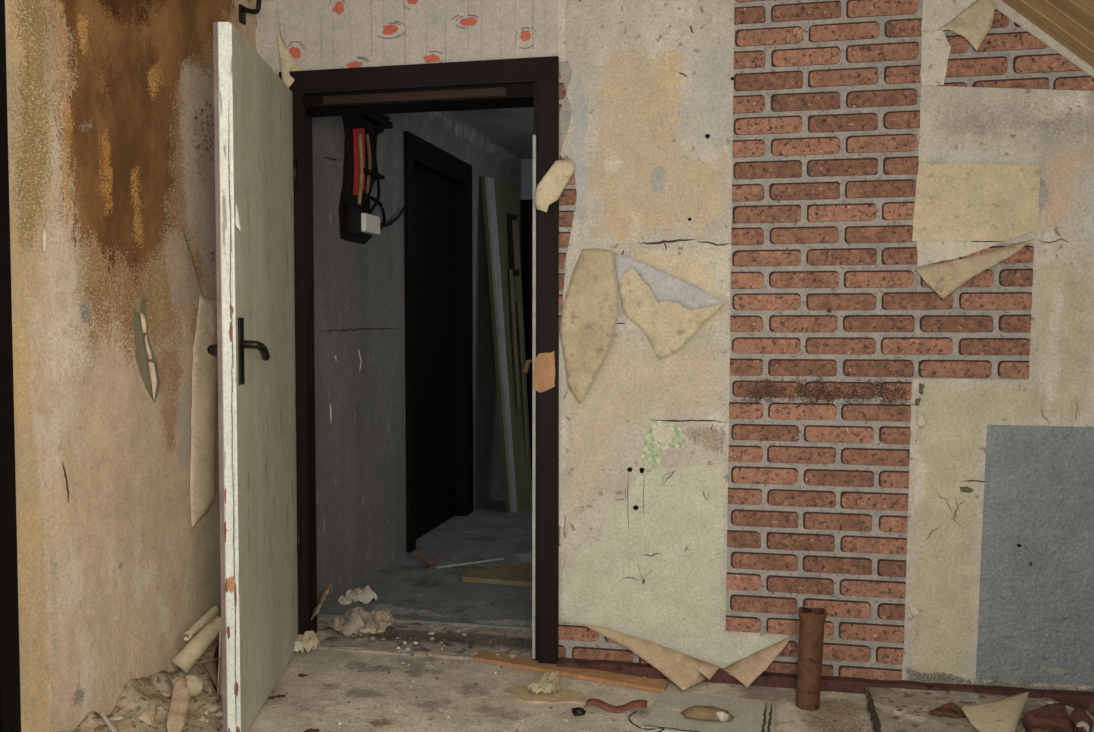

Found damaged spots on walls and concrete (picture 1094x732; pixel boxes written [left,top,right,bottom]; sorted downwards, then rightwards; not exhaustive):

water stain [7,0,252,475]
peeling [140,312,157,400]